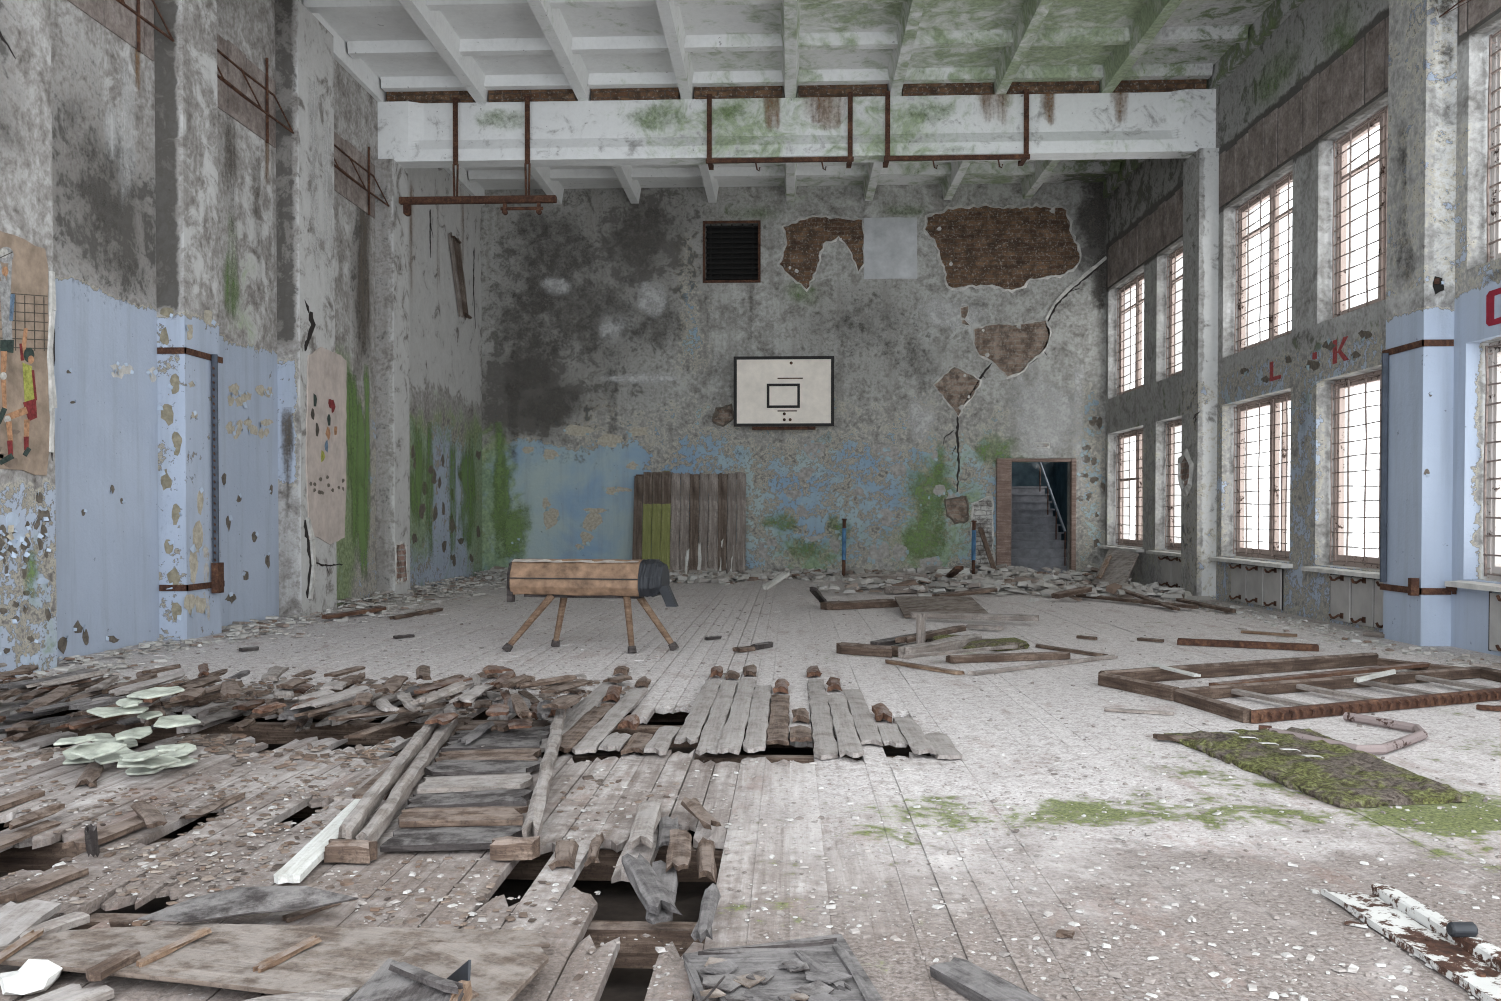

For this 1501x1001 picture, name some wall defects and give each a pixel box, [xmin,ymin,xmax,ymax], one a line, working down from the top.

crack [0,31,16,59]
peeling [159,307,216,348]
damp [494,214,682,559]
spalling [778,215,865,292]
spalling [933,366,982,417]
spalling [923,203,1081,379]
crack [942,256,1107,492]
peeling [110,361,207,621]
peeling [221,473,242,531]
damp [426,428,476,551]
peeling [0,490,51,665]
peeling [58,620,119,654]